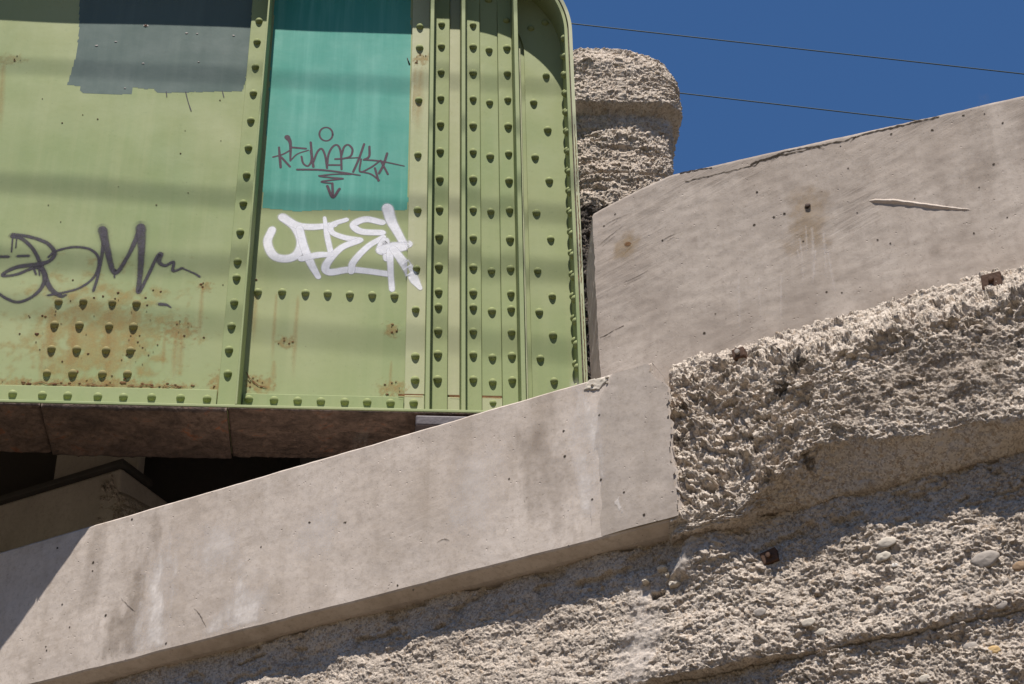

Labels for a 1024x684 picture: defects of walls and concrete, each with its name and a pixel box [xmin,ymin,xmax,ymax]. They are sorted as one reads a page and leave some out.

crack [680,116,939,182]
rust [21,343,195,389]